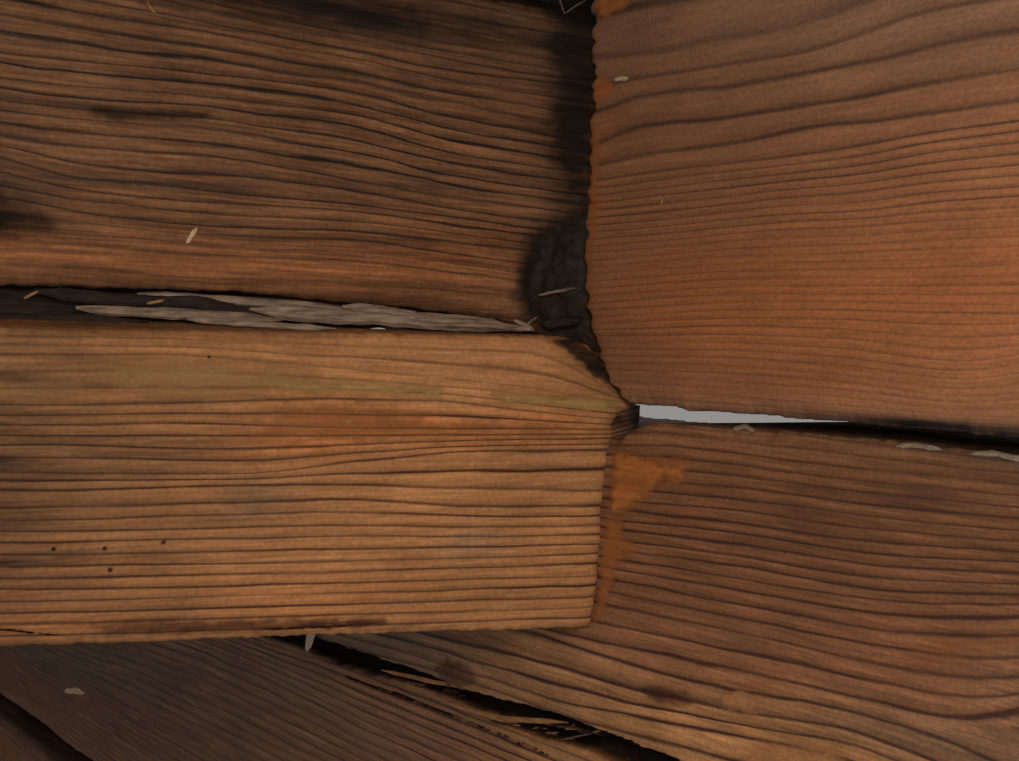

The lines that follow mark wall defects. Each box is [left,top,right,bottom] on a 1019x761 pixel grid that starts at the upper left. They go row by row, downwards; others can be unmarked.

crack [0,628,59,636]
crack [261,624,680,761]